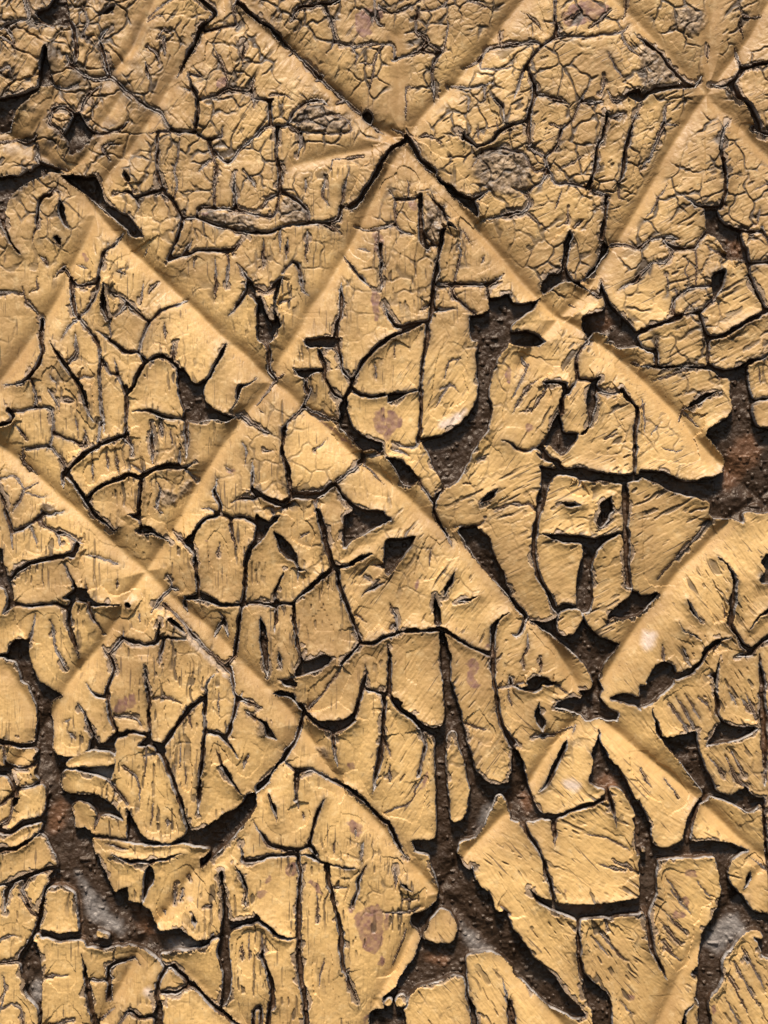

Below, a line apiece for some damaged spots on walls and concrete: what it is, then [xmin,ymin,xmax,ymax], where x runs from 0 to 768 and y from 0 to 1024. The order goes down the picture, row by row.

crack [0,0,768,381]
peeling [176,343,236,424]
peeling [284,0,768,722]
crack [512,340,699,589]
rust [718,431,767,496]
crack [0,179,581,1024]
peeling [0,510,768,1024]
crack [506,556,768,980]
rust [759,703,768,758]
rust [127,900,159,939]
rust [557,903,612,916]
crack [726,946,766,1024]